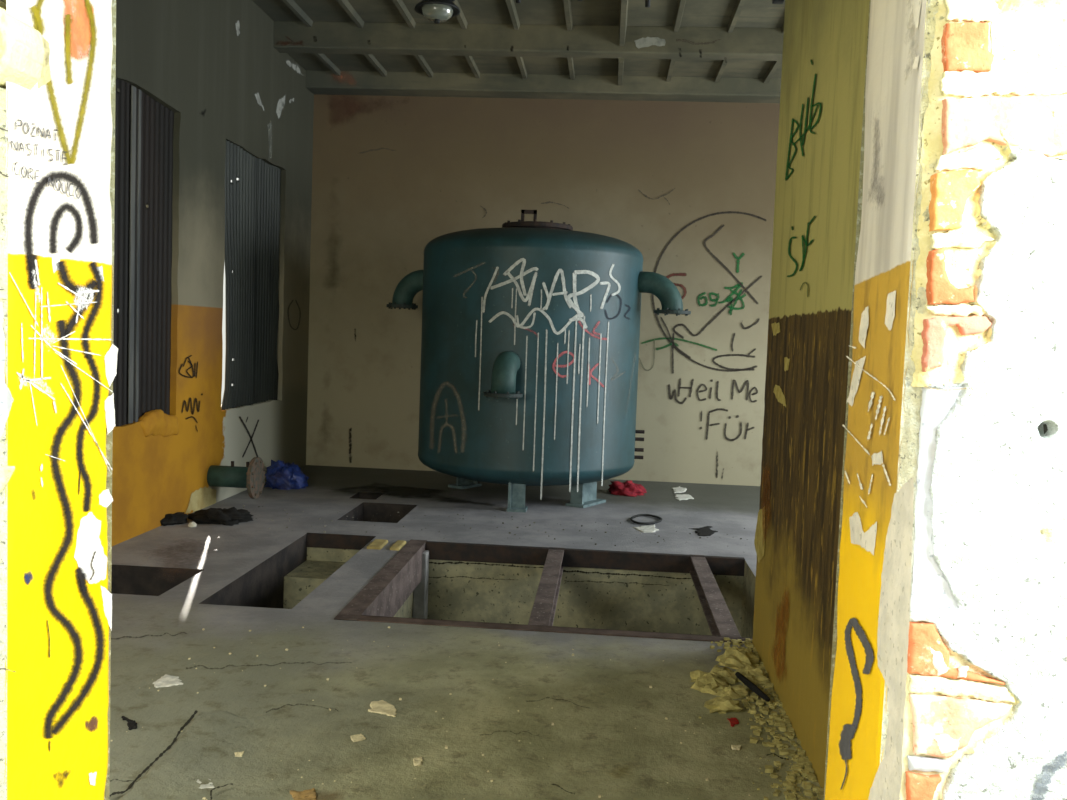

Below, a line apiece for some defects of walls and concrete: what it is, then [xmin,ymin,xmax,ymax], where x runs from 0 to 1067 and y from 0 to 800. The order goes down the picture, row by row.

peeling [0,302,14,437]
spalling [847,0,1067,800]
peeling [0,466,15,493]
peeling [74,489,113,630]
peeling [186,487,216,513]
crack [110,710,198,797]